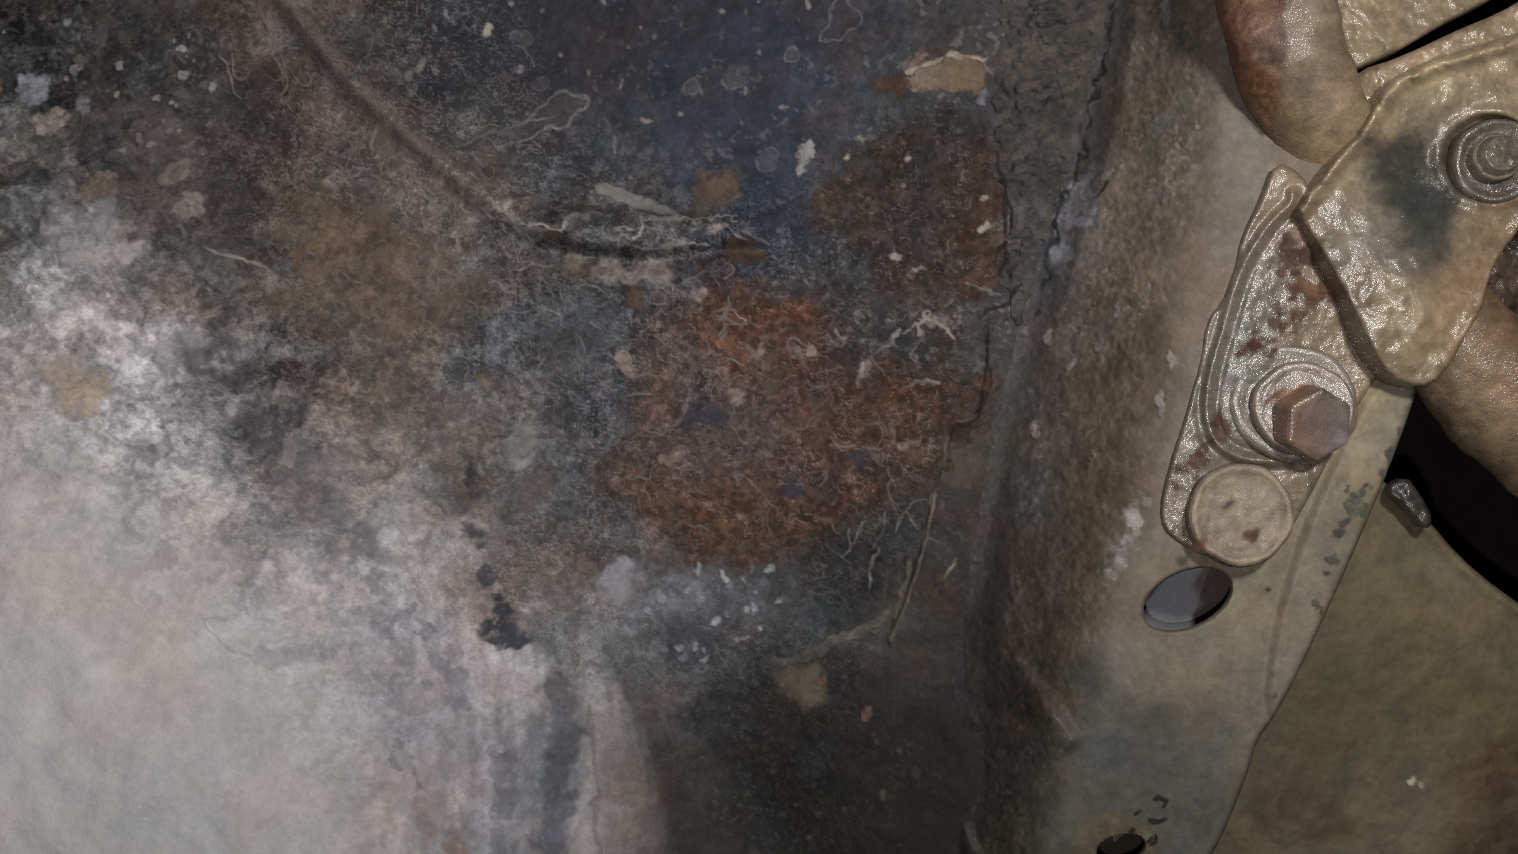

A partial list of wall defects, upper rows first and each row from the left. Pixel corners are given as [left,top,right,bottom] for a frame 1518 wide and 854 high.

peeling [905,51,987,105]
crack [1074,14,1114,192]
crack [982,151,1060,317]
rust [597,288,998,568]